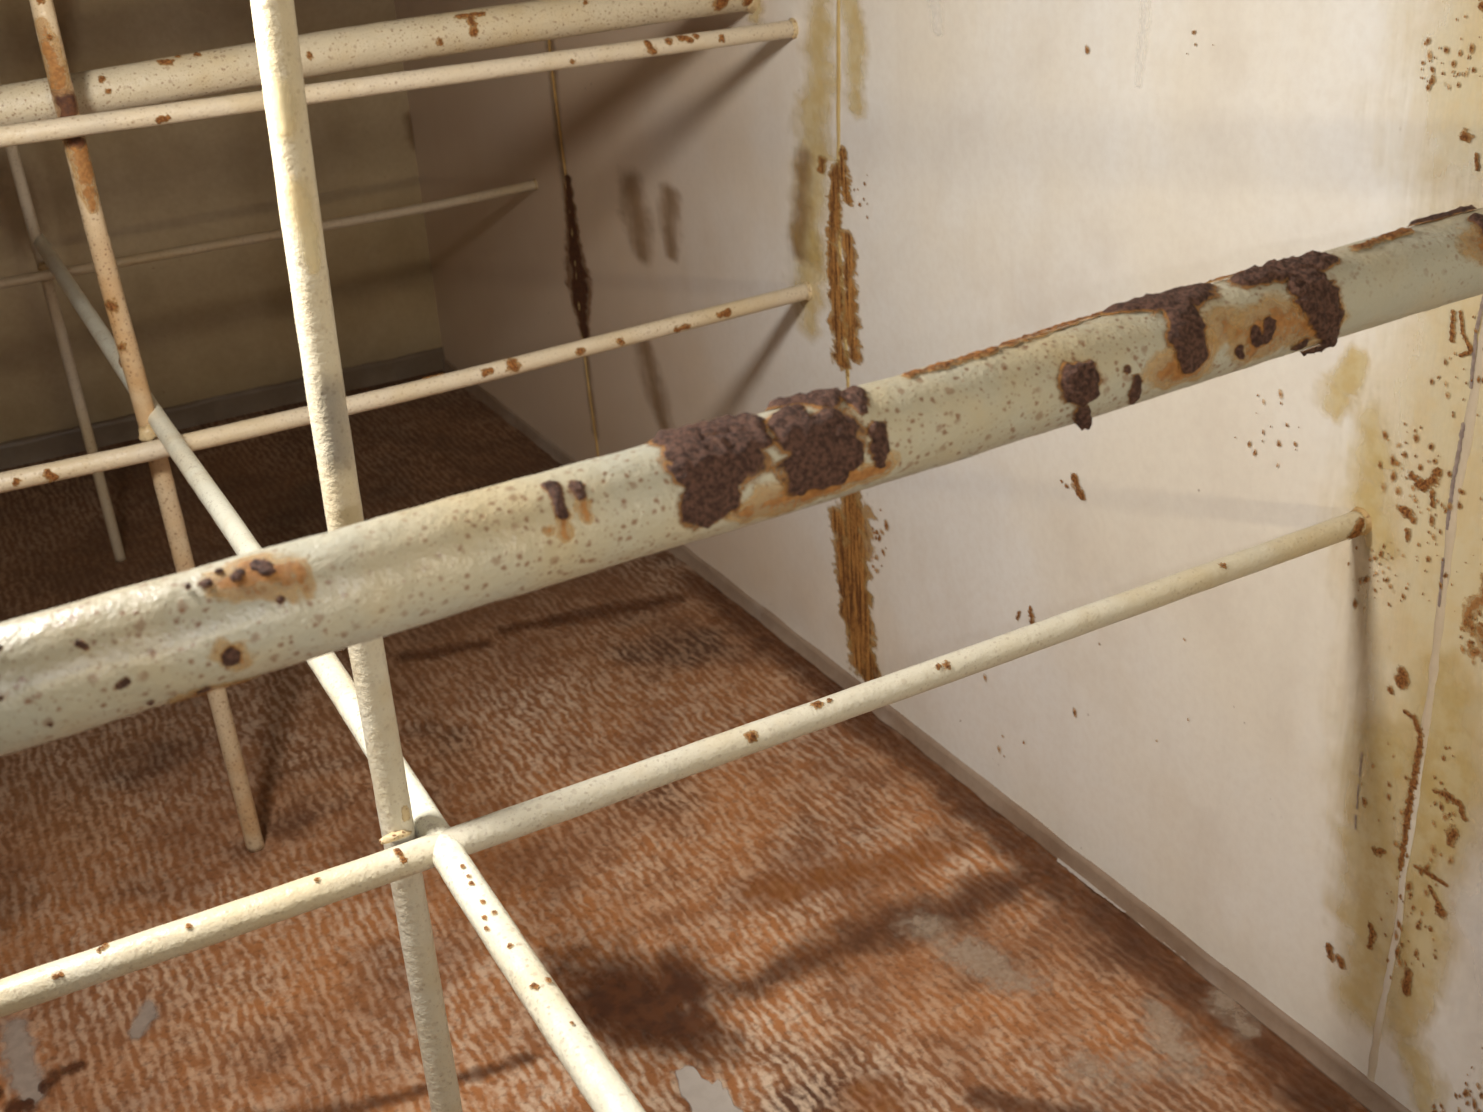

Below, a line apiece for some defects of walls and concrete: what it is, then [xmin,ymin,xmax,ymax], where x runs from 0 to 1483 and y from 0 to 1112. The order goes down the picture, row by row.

damp [795,0,864,333]
rust [1420,0,1483,91]
damp [1432,0,1483,163]
rust [564,175,591,356]
rust [540,480,587,520]
rust [648,145,893,682]
damp [1326,349,1366,416]
rust [1347,422,1483,664]
rust [1430,309,1483,418]
rust [401,576,845,709]
damp [1338,294,1483,1112]
rust [743,711,1365,1112]